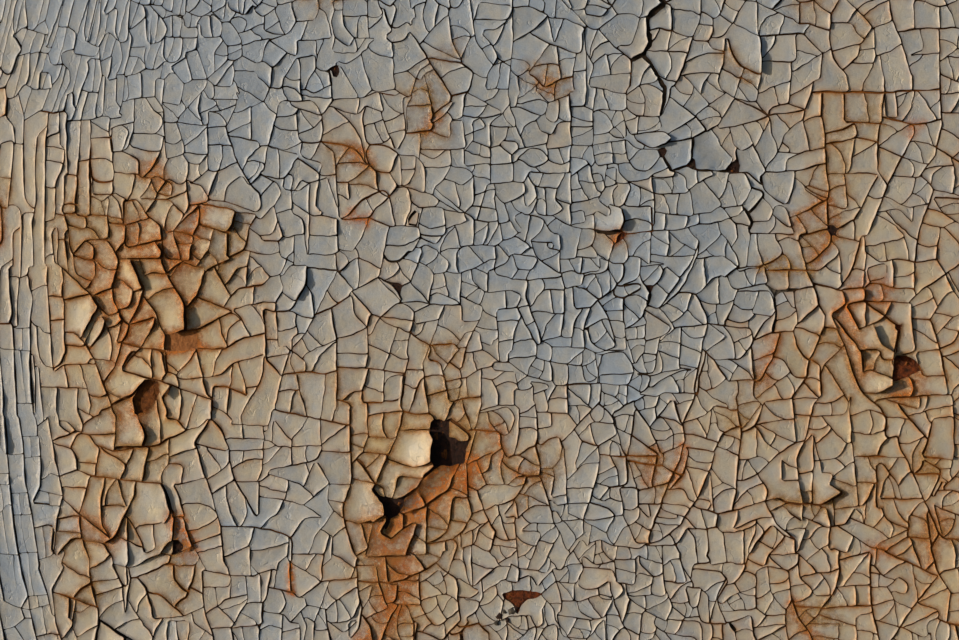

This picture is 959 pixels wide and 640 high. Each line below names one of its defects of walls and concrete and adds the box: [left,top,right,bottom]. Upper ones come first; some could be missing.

crack [0,9,70,81]
crack [0,154,37,245]
crack [0,286,24,358]
rust [63,204,152,344]
rust [110,201,241,355]
peeling [832,289,922,393]
crack [0,376,28,592]
rust [105,393,165,479]
peeling [105,344,169,446]
peeling [344,413,469,557]
rust [353,416,548,640]
peeling [463,590,543,640]